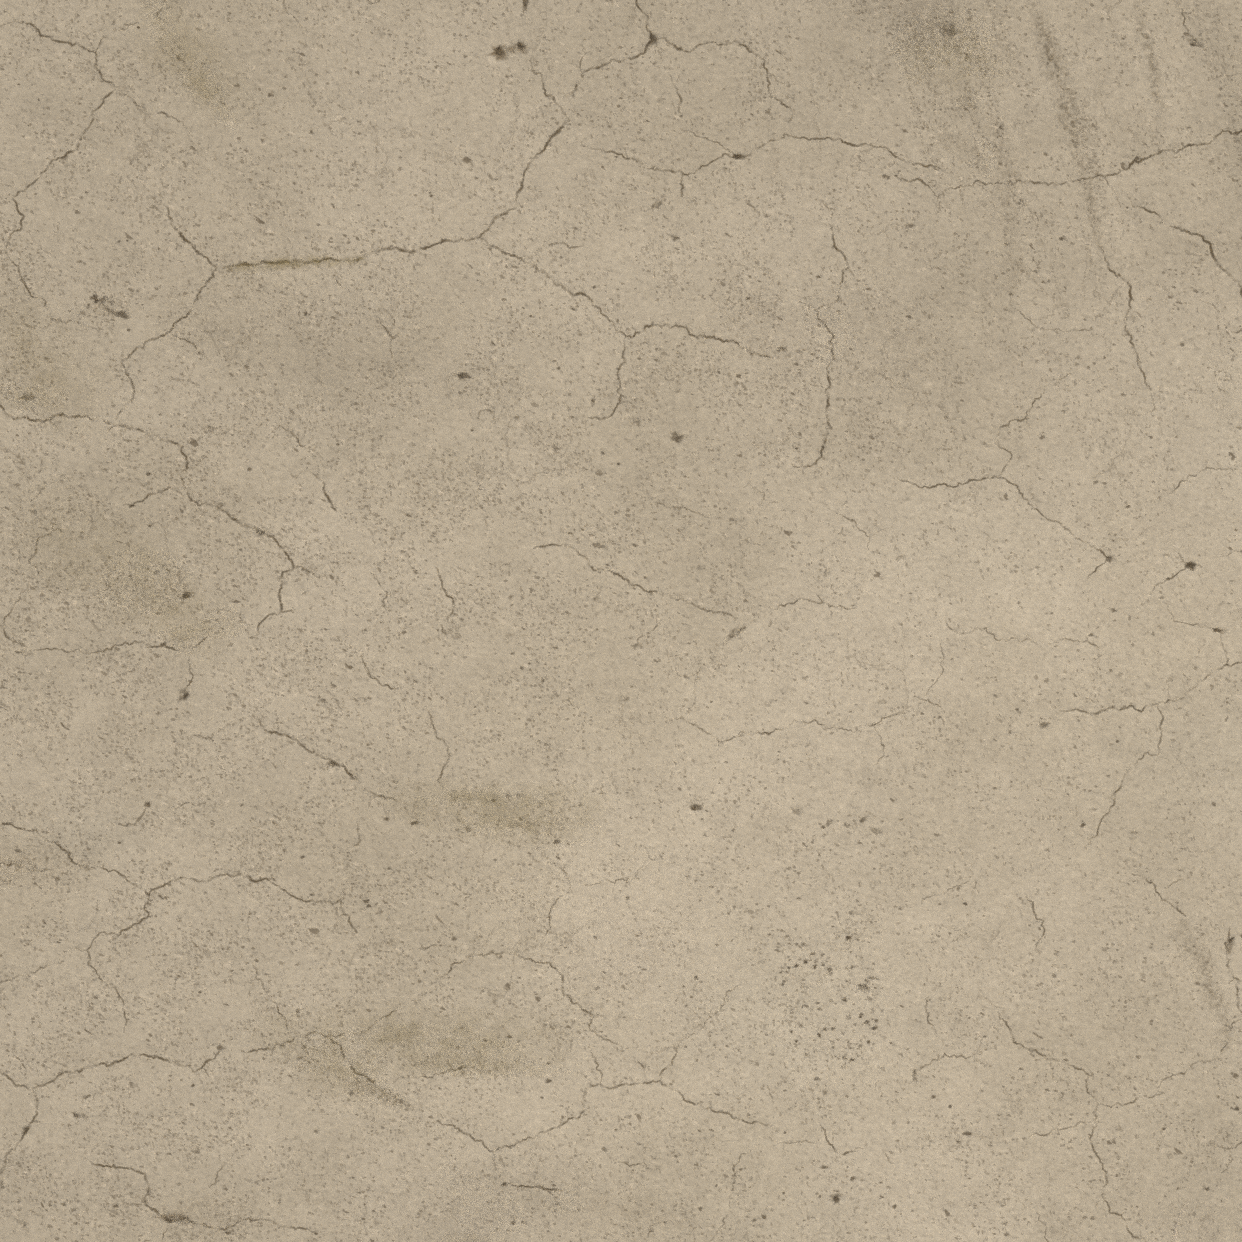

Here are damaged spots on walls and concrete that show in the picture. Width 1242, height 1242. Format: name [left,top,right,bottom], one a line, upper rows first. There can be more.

crack [26,23,112,121]
crack [587,0,788,107]
crack [481,127,562,258]
crack [802,137,979,189]
crack [1144,208,1215,258]
crack [121,211,360,364]
crack [575,292,769,373]
crack [1105,260,1145,377]
crack [918,397,1041,512]
crack [258,535,309,627]
crack [13,825,182,1016]
crack [219,874,352,926]